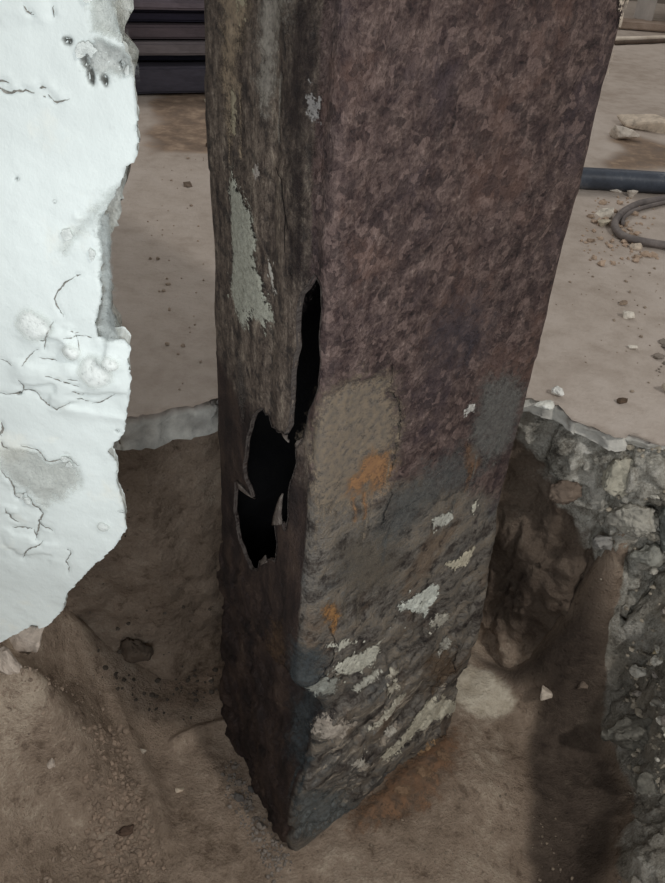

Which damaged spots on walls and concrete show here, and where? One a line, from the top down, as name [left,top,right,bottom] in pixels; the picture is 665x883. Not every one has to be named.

crack [0,80,69,103]
crack [2,275,113,410]
crack [0,423,78,466]
crack [1,470,53,556]
peeling [272,493,284,525]
corrosion [346,451,392,521]